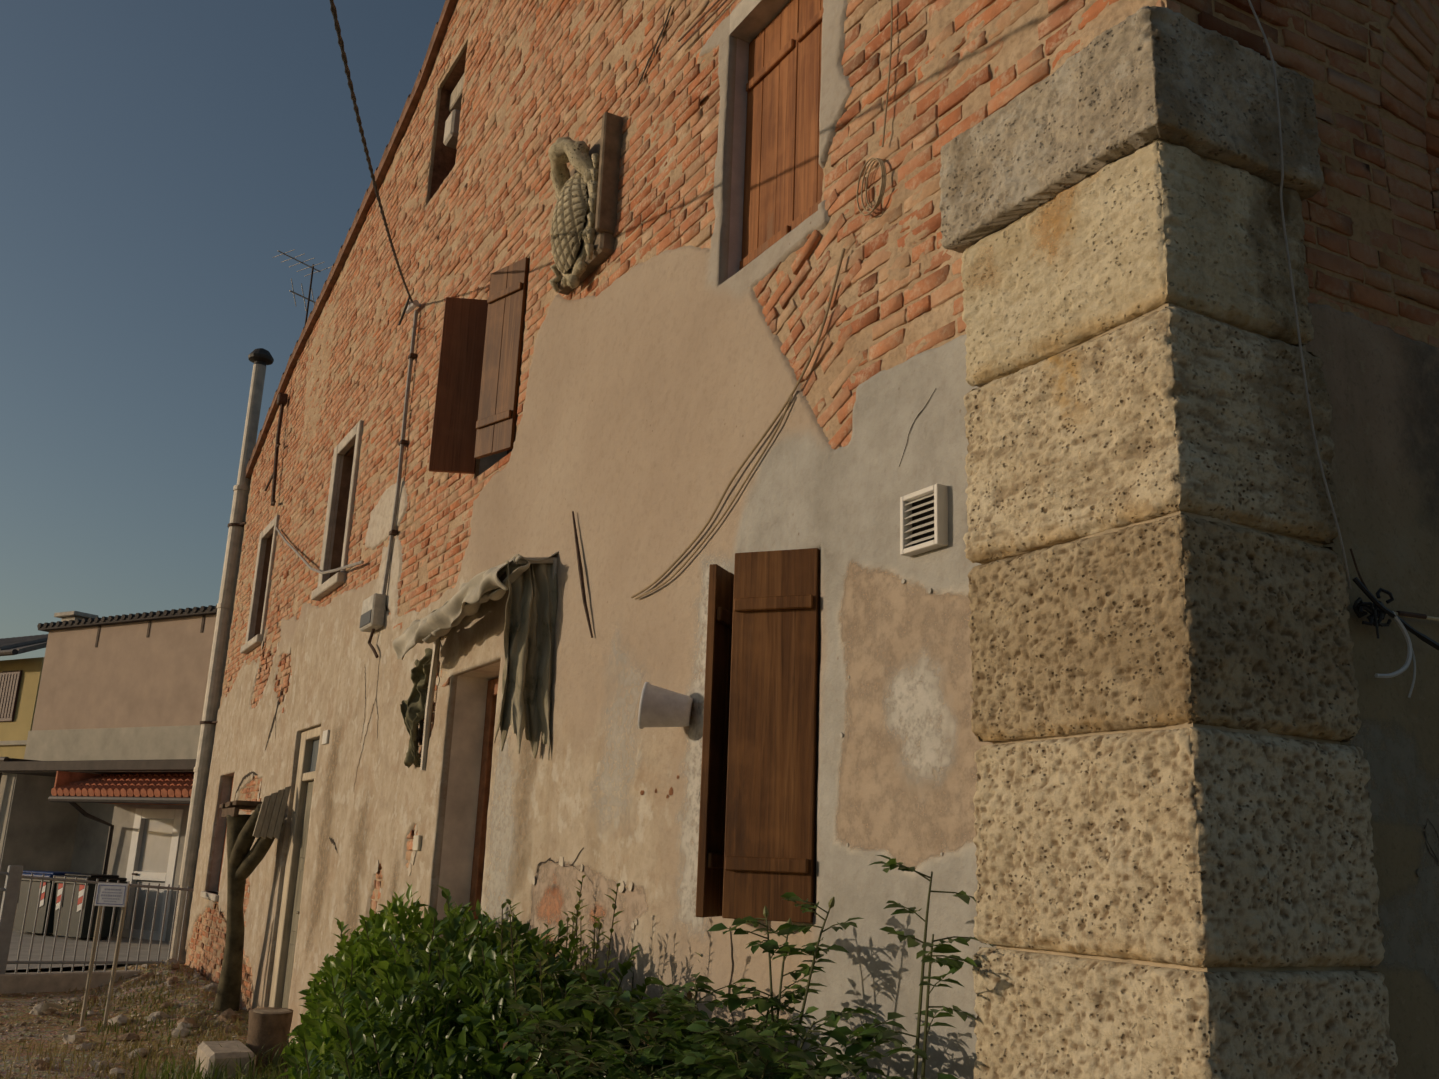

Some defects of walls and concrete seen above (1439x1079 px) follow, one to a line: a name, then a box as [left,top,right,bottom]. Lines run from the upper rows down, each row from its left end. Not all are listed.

spalling [251,592,292,713]
flaking render [836,563,993,868]
spalling [184,902,227,984]
spalling [240,949,253,1011]
flaking render [530,856,647,987]